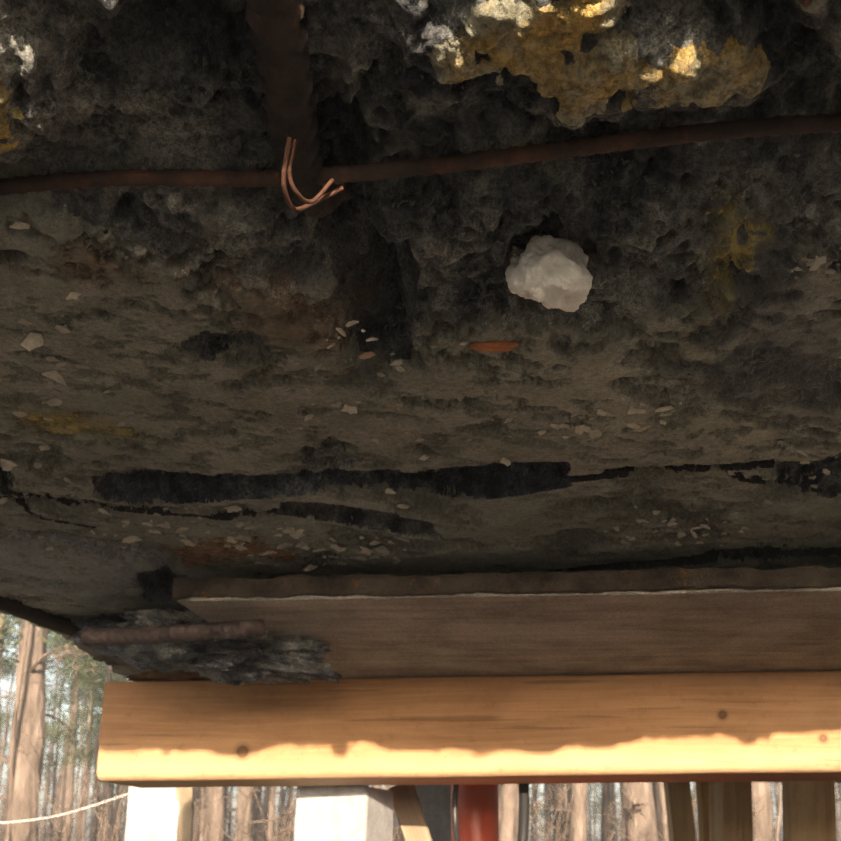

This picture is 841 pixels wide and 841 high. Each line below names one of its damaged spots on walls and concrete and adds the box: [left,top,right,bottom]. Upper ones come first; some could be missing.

spalling [0,0,841,362]
peeling [13,356,96,429]
peeling [390,353,405,372]
crack [0,467,277,529]
crack [569,459,802,485]